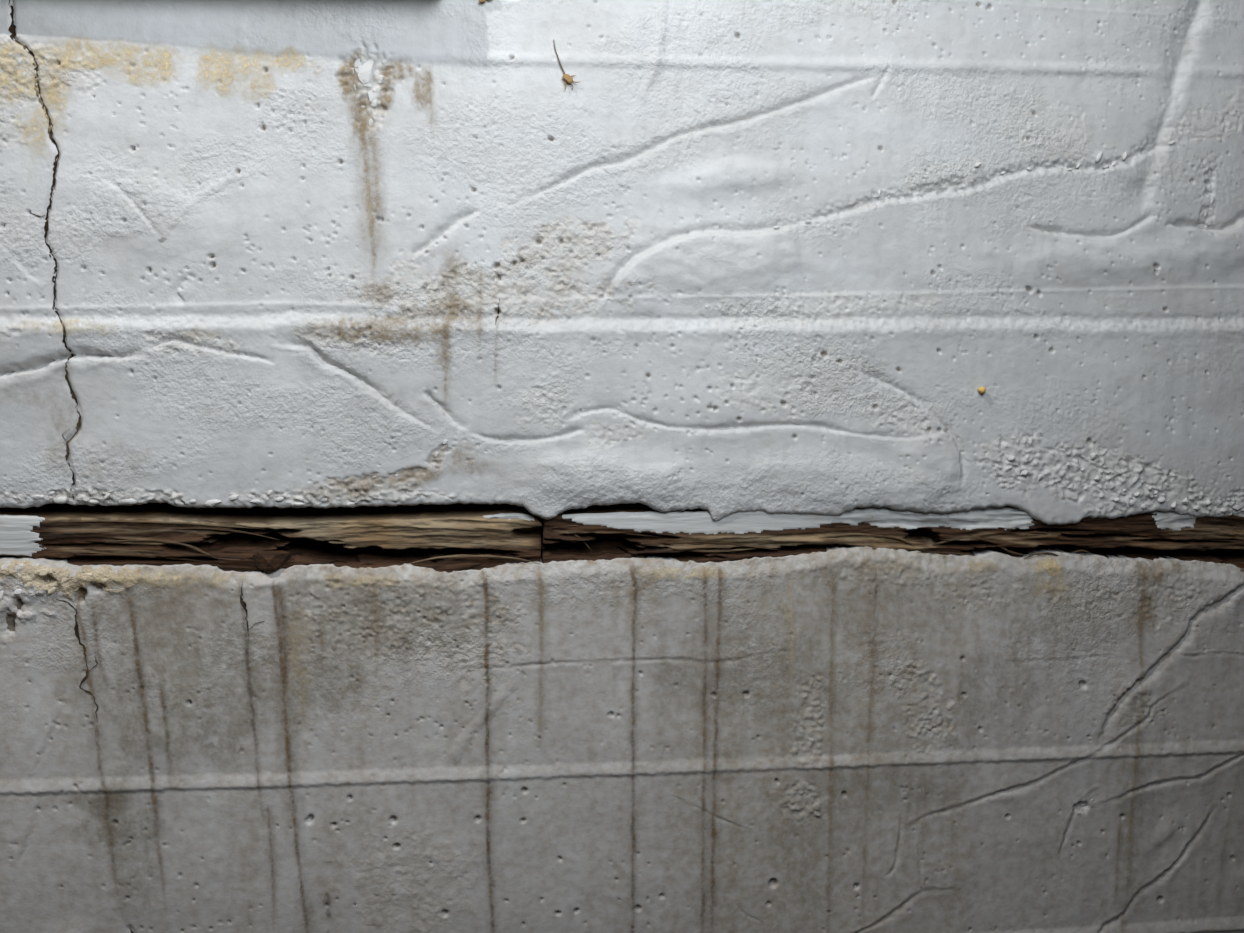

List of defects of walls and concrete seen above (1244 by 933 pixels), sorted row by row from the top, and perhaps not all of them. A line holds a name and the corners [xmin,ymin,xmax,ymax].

leakage [0,41,171,141]
crack [8,0,81,500]
peeling [833,509,1035,530]
peeling [1152,513,1196,530]
spalling [0,560,142,631]
crack [57,599,98,716]